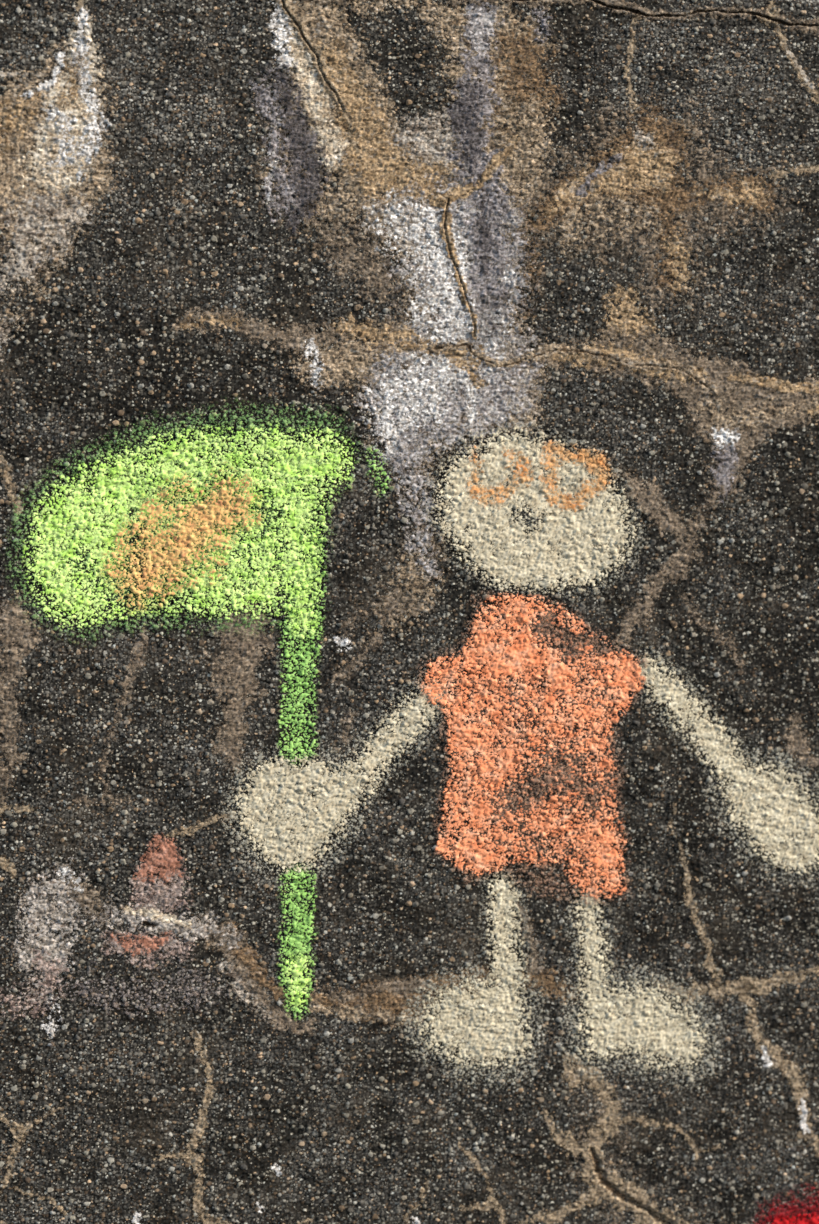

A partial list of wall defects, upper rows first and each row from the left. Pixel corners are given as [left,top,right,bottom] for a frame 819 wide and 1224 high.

crack [0,69,46,77]
crack [271,0,375,159]
crack [448,0,819,110]
crack [429,133,819,416]
crack [0,856,17,879]
crack [0,802,37,816]
crack [165,811,236,838]
crack [654,802,819,1154]
crack [0,1103,69,1224]
crack [153,1030,232,1224]
crack [404,1177,431,1224]
crack [458,1052,721,1224]